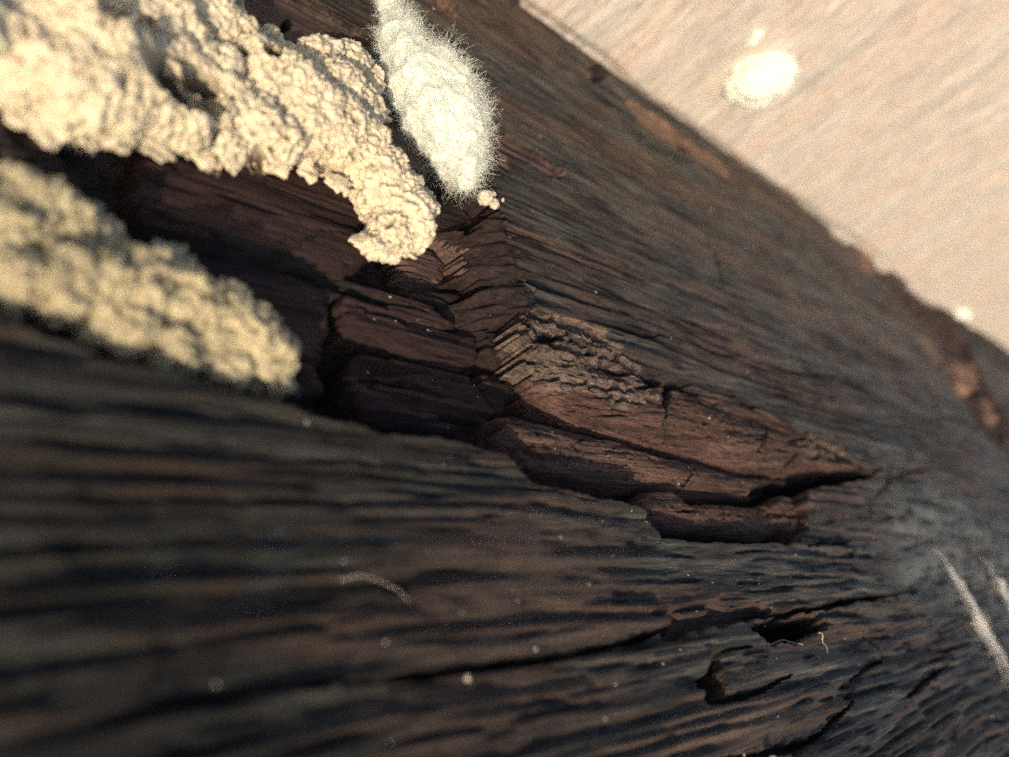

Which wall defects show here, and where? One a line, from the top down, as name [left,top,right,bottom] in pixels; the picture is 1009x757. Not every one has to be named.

spalling [0,0,881,546]
crack [95,588,937,727]